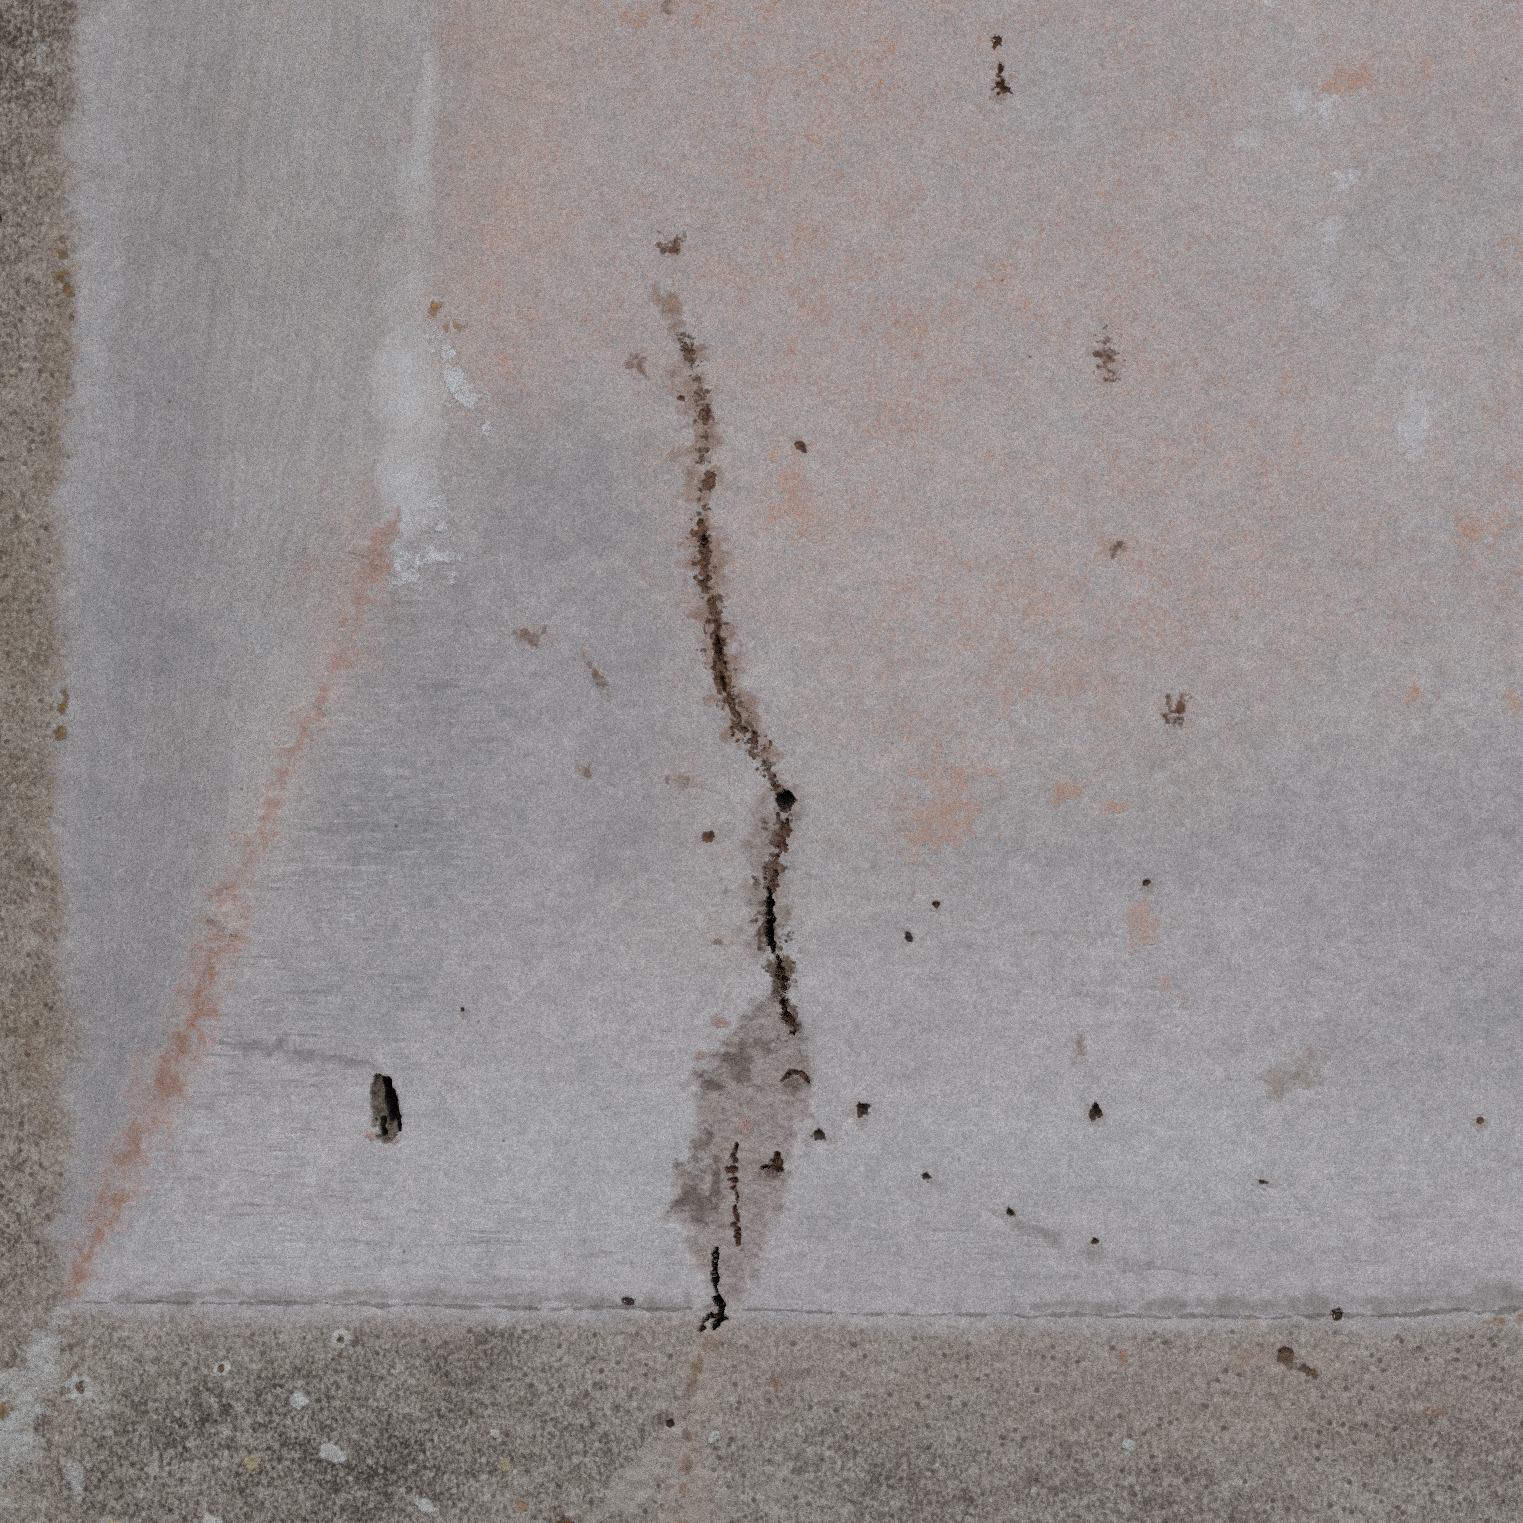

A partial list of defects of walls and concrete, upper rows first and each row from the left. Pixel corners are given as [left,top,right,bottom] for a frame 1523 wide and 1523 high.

rust [62,504,404,1304]
spalling [380,1077,402,1136]
crack [645,279,813,1083]